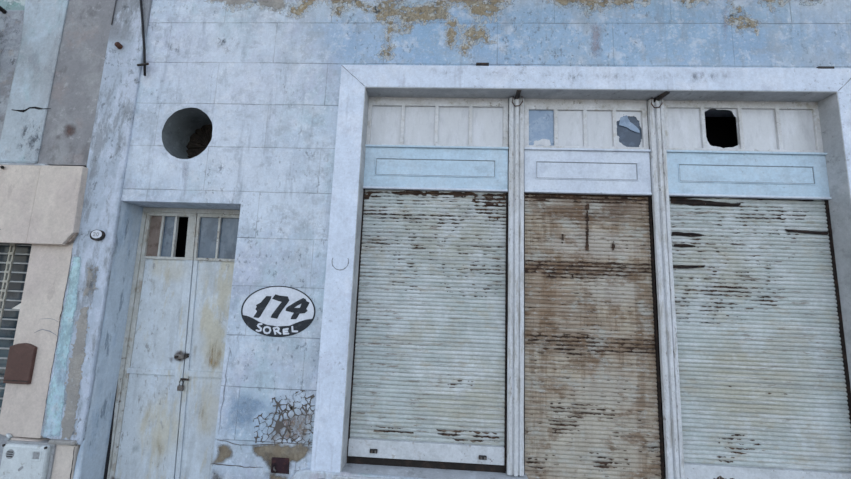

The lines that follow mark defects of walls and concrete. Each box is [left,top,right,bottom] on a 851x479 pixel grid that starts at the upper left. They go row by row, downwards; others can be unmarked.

peeling [207,0,513,62]
peeling [546,0,651,18]
peeling [724,0,762,36]
crack [12,105,51,113]
corrosion [364,190,506,297]
corrosion [525,193,648,251]
corrosion [525,241,652,306]
corrosion [670,196,828,325]
corrosion [527,317,656,386]
crack [212,347,315,468]
corrosion [437,429,499,444]
corrosion [538,387,626,443]